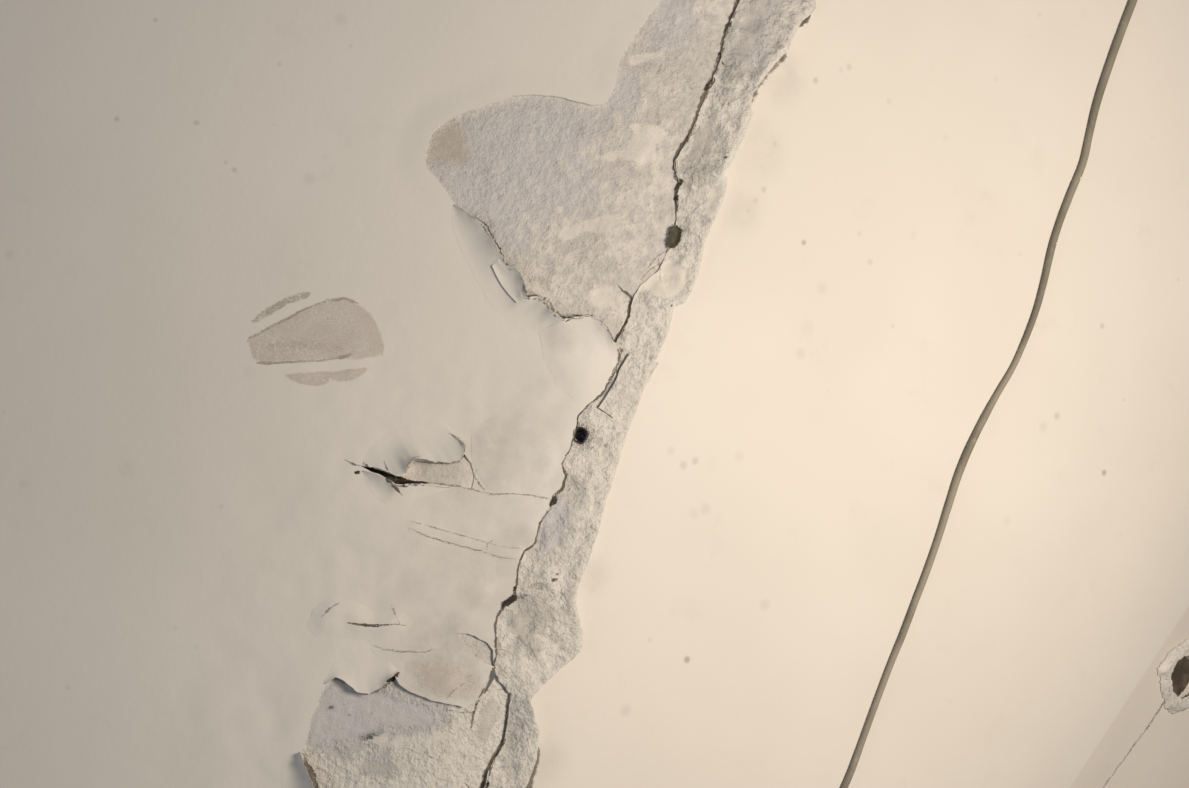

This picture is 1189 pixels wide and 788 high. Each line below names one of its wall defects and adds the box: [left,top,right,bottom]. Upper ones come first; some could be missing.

crack [672,0,740,210]
water stain [247,291,384,386]
spalling [282,0,816,788]
crack [439,250,667,788]
crack [1105,700,1165,785]